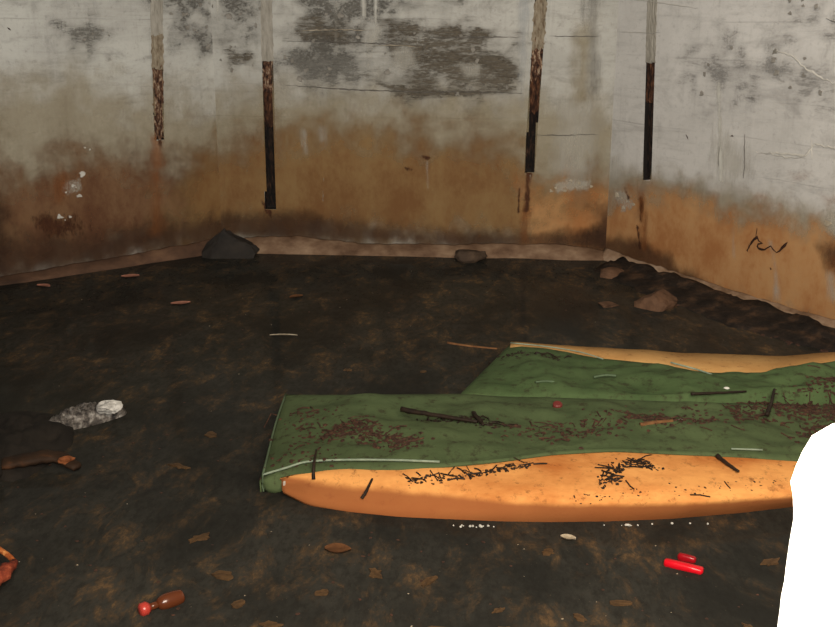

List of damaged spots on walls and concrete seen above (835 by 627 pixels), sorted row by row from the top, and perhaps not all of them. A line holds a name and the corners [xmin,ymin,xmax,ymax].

rust [152,65,164,144]
rust [262,61,275,128]
rust [528,36,544,115]
rust [646,62,655,103]
damp [0,89,835,320]
rust [518,173,532,213]